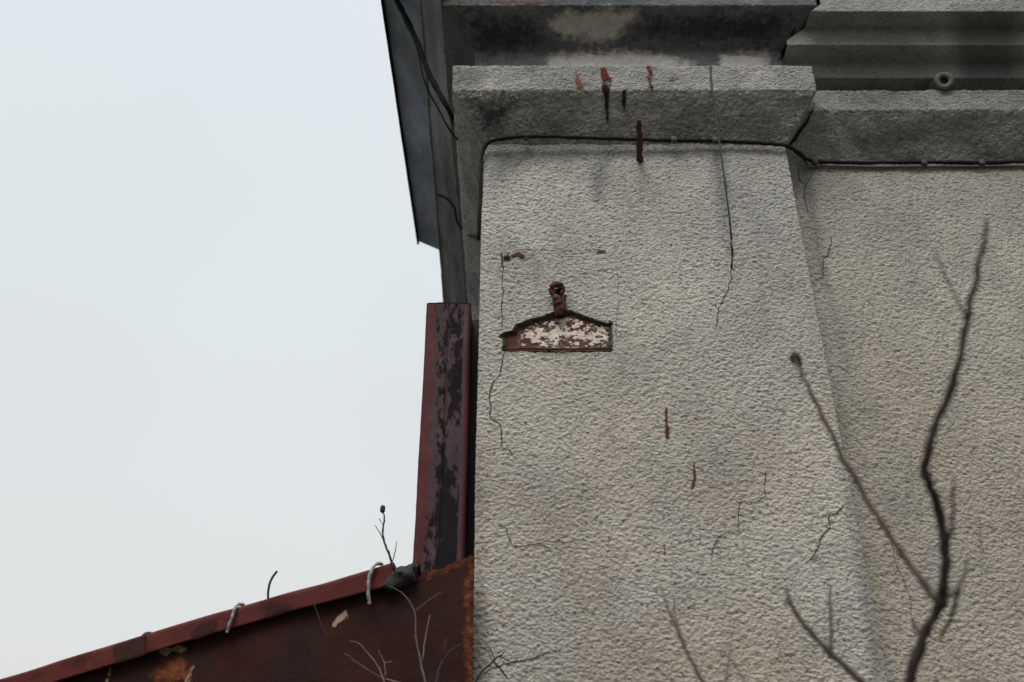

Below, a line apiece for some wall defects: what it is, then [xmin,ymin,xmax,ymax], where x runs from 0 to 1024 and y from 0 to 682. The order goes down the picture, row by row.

crack [788,104,815,211]
crack [486,249,619,457]
peeling [499,310,613,353]
crack [694,471,767,561]
crack [804,505,844,565]
rust [113,636,146,661]
rust [150,656,191,682]
rust [427,560,474,682]